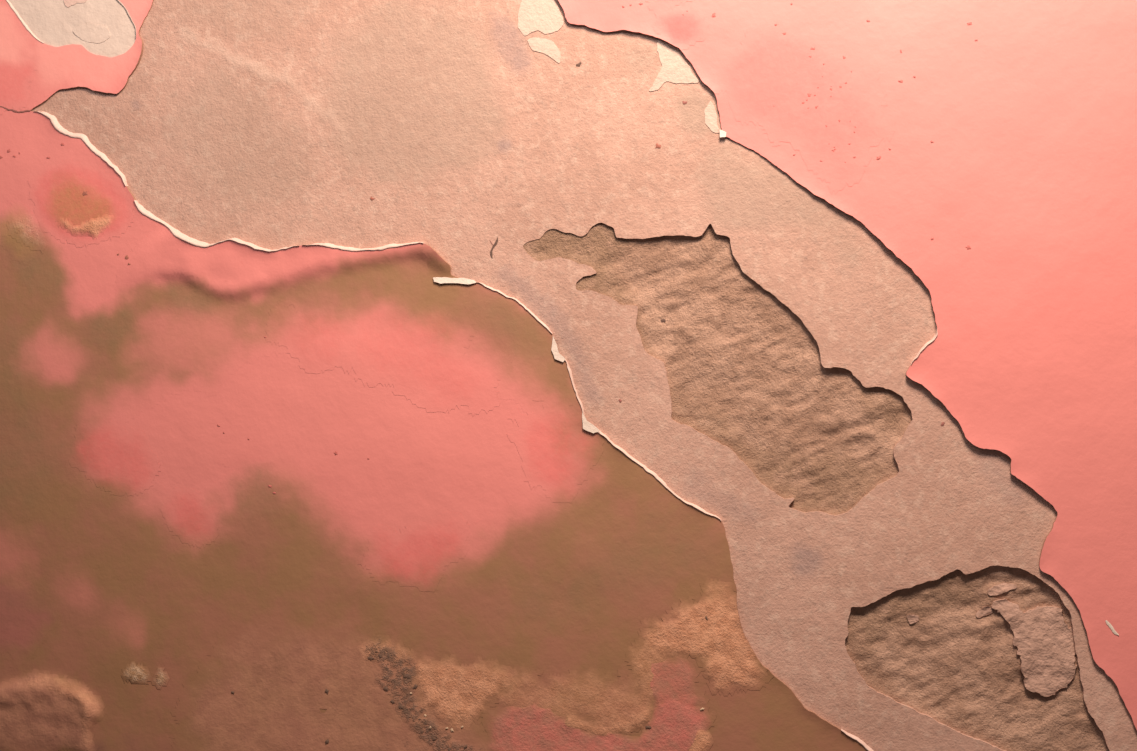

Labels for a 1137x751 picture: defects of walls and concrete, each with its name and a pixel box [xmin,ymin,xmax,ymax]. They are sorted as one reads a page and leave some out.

peeling [6,0,136,57]
peeling [518,0,564,36]
peeling [649,39,699,91]
peeling [704,101,726,137]
peeling [34,111,128,186]
peeling [134,200,293,252]
peeling [310,242,423,251]
peeling [481,283,553,334]
spalling [523,223,913,521]
water stain [0,159,867,751]
spalling [841,565,1110,751]
spalling [481,655,717,751]